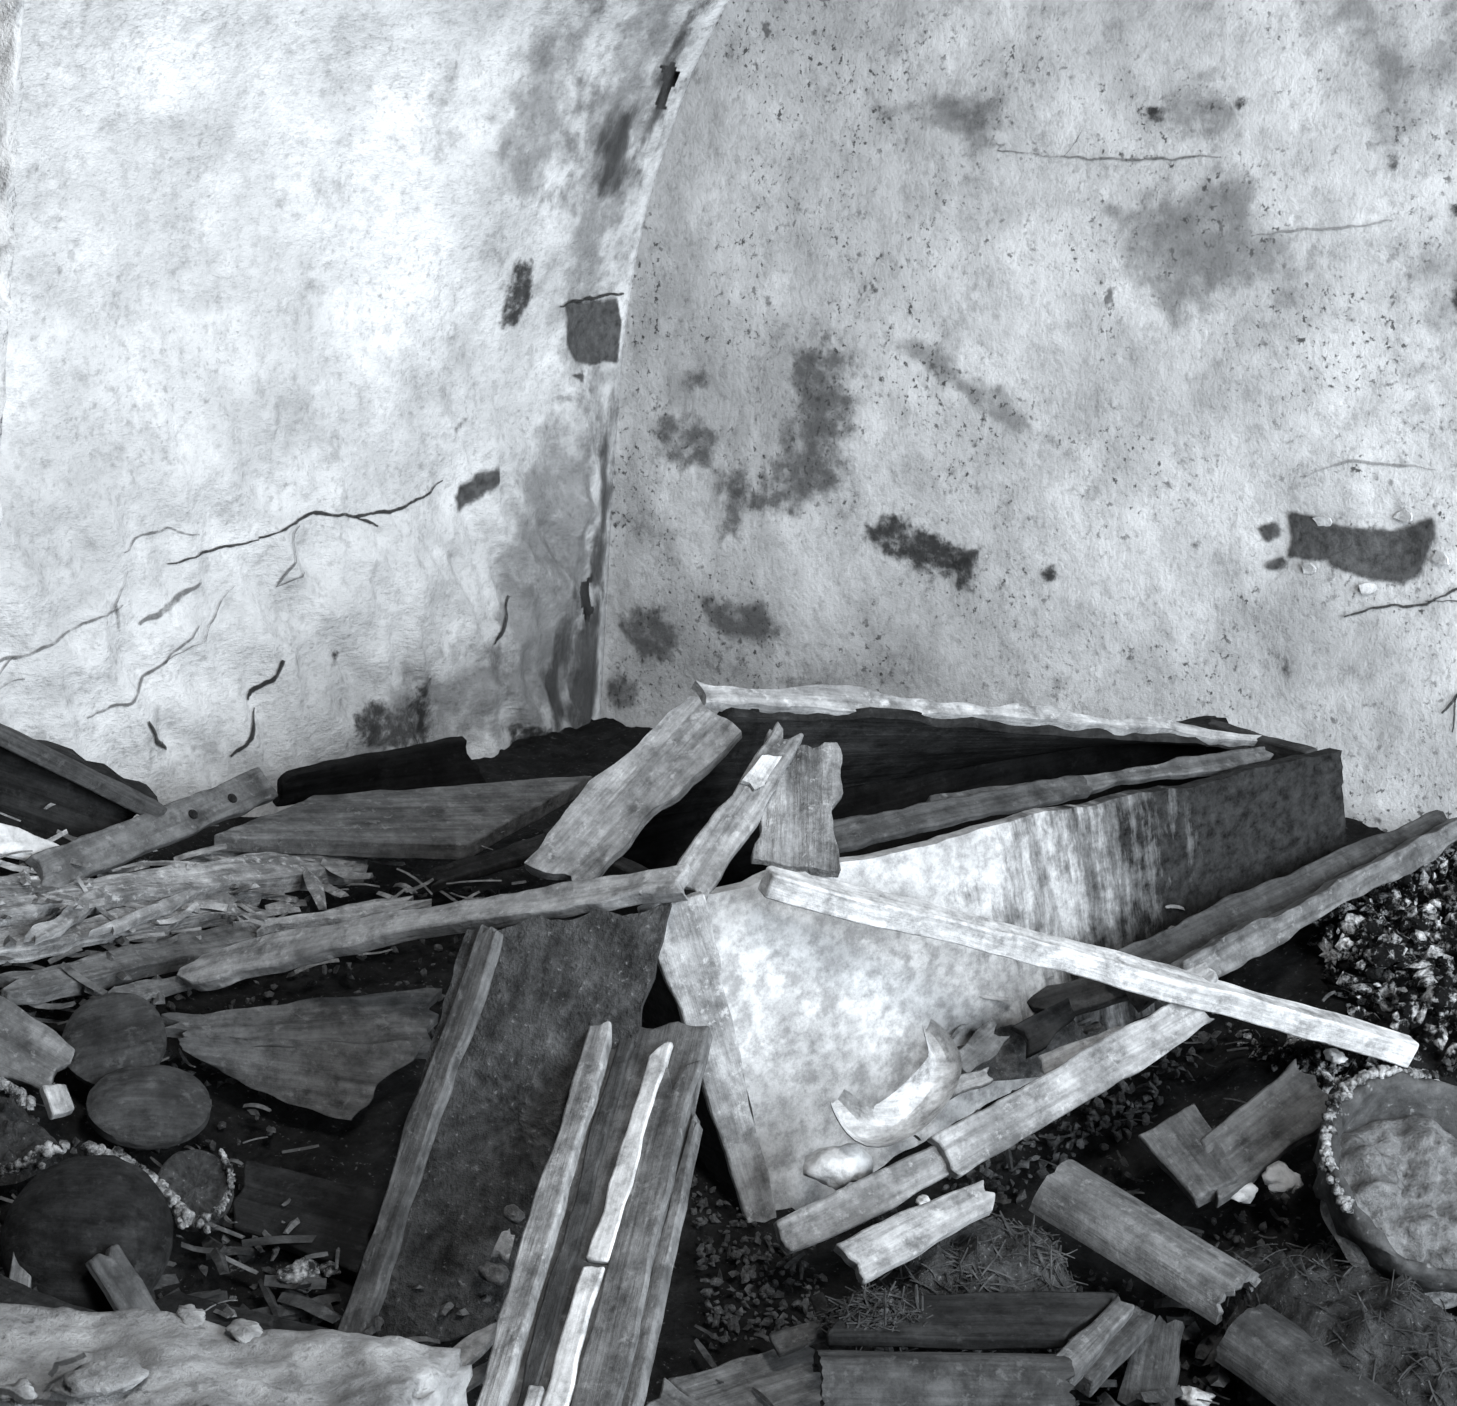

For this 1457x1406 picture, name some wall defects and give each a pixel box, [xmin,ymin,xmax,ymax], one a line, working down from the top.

leakage [599,1,710,196]
leakage [503,260,532,329]
spalling [560,293,624,382]
leakage [719,337,853,538]
spalling [457,469,500,511]
crack [0,480,443,681]
leakage [510,408,635,746]
leakage [704,598,779,640]
spalling [1259,510,1449,594]
crack [89,601,222,750]
crack [230,660,285,757]
leakage [354,678,431,748]